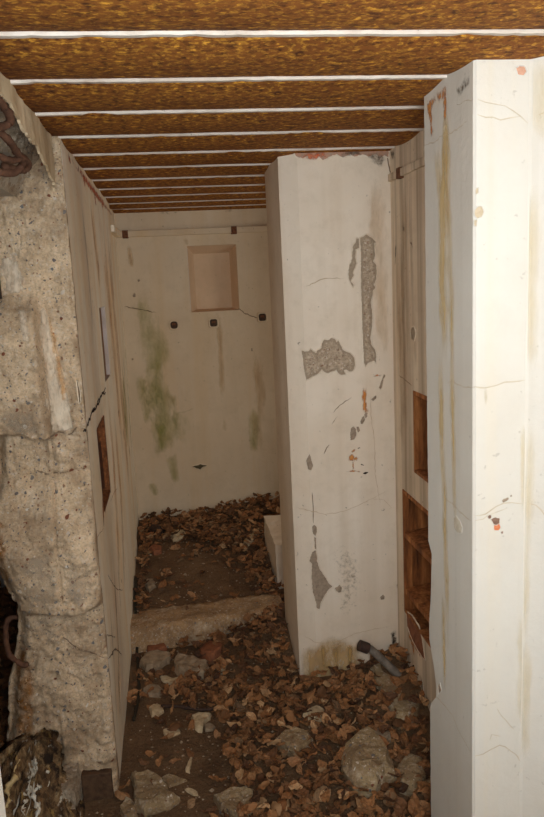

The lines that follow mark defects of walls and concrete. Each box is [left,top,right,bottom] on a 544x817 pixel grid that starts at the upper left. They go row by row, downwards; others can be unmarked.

spalling [0,72,55,197]
rust [427,91,446,134]
spalling [300,233,378,381]
crack [46,389,106,440]
spalling [308,524,343,610]
crack [44,629,122,659]
leakage [307,644,356,677]